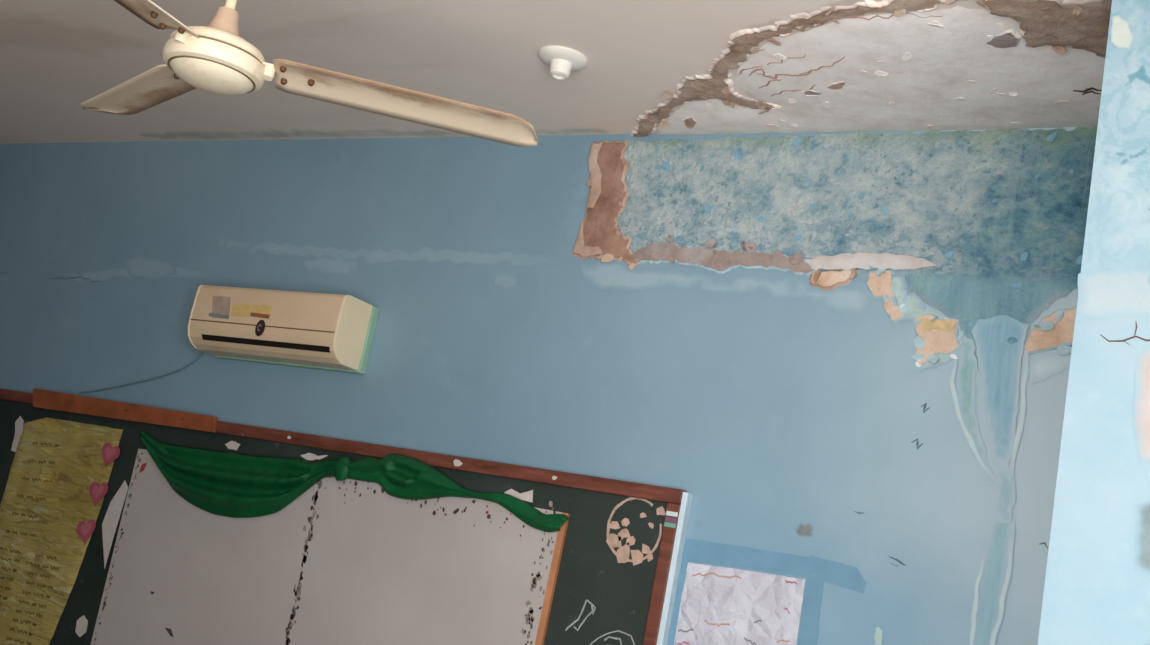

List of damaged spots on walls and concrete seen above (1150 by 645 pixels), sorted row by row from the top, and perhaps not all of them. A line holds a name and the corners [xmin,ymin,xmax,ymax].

peeling [572,0,1097,384]
crack [739,0,957,96]
spalling [976,0,1134,58]
water stain [211,232,1030,645]